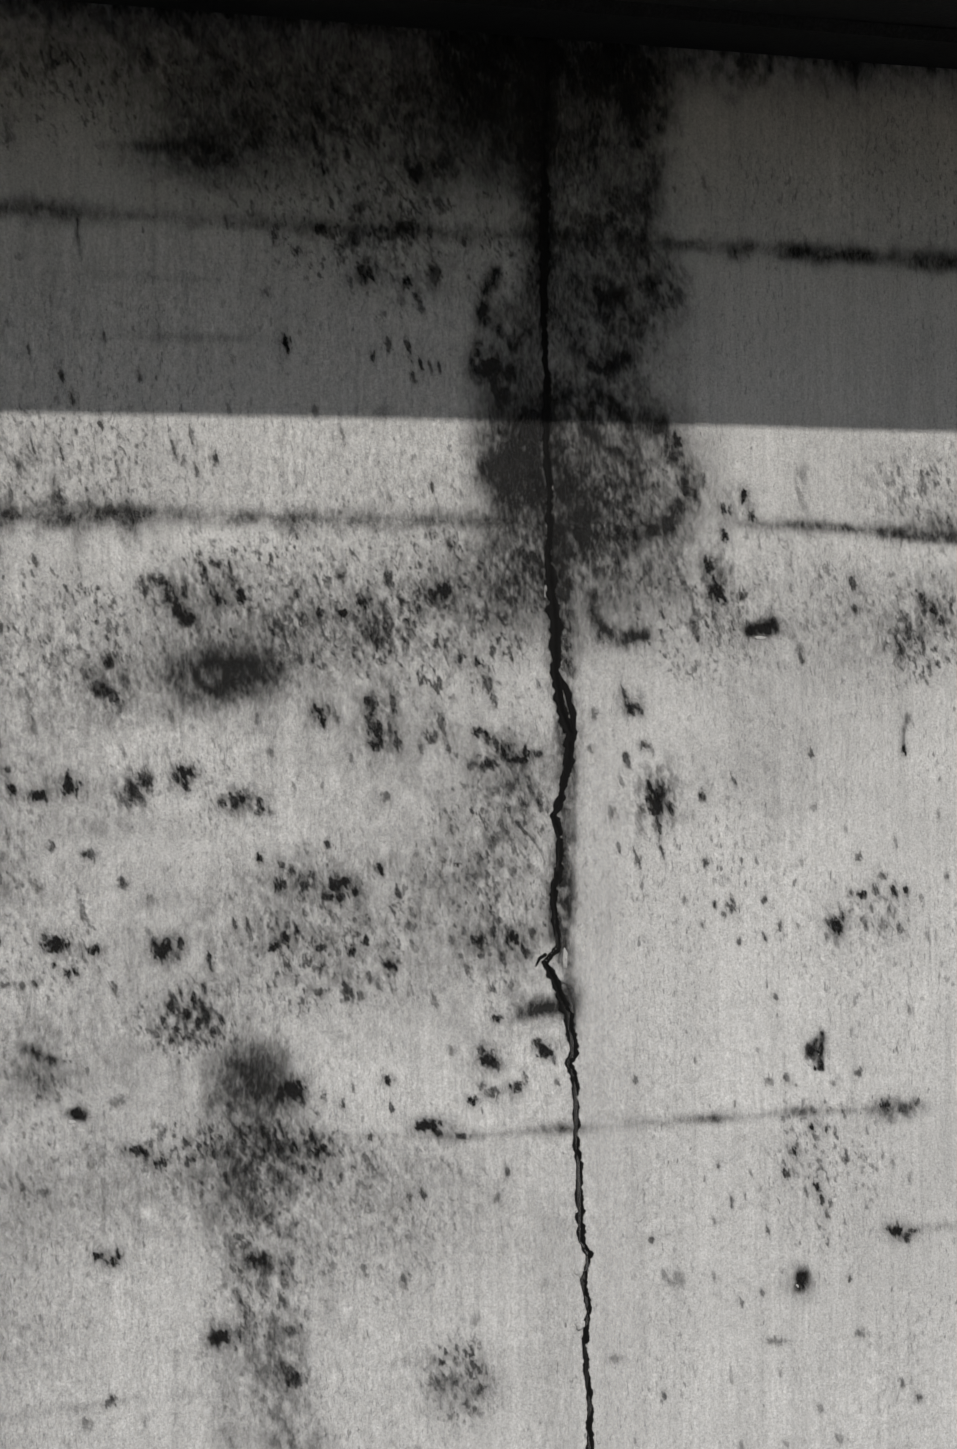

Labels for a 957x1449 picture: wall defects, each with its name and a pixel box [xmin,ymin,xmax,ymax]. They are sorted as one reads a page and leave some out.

damp [385,29,705,706]
damp [0,489,154,527]
damp [139,549,250,627]
damp [161,607,337,706]
damp [5,767,82,802]
damp [257,853,359,902]
damp [454,697,592,1023]
crack [519,38,601,1449]
damp [642,777,674,856]
damp [40,934,100,979]
damp [155,952,223,1053]
damp [124,1046,331,1227]